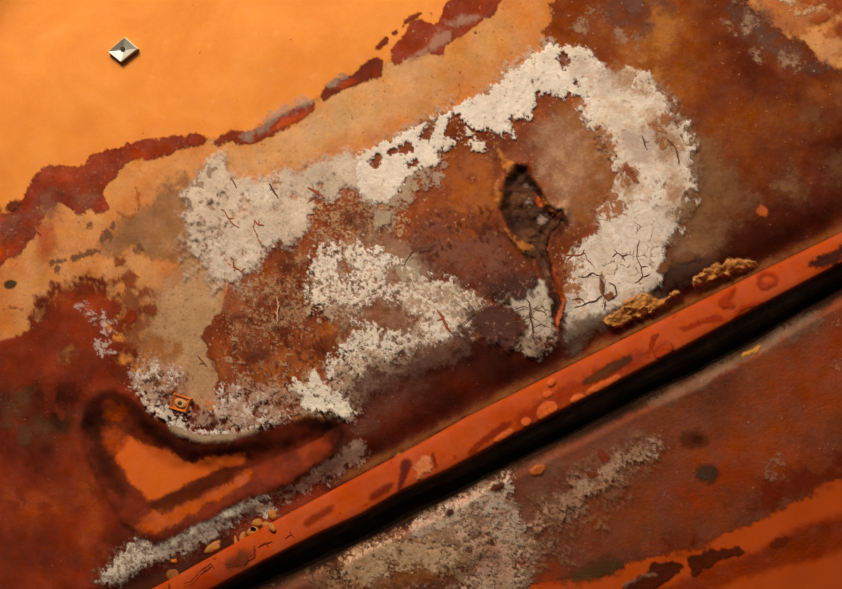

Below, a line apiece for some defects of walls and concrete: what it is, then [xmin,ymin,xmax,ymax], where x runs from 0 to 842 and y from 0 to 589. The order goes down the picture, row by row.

corrosion [0,0,501,266]
water stain [99,37,700,444]
corrosion [201,90,618,434]
spalling [493,143,566,326]
crack [564,240,650,310]
crack [642,136,679,164]
corrosion [809,245,842,268]
corrosion [0,274,234,589]
water stain [92,439,366,589]
water stain [325,435,664,589]
corrosion [259,292,842,589]
peeling [623,546,744,589]